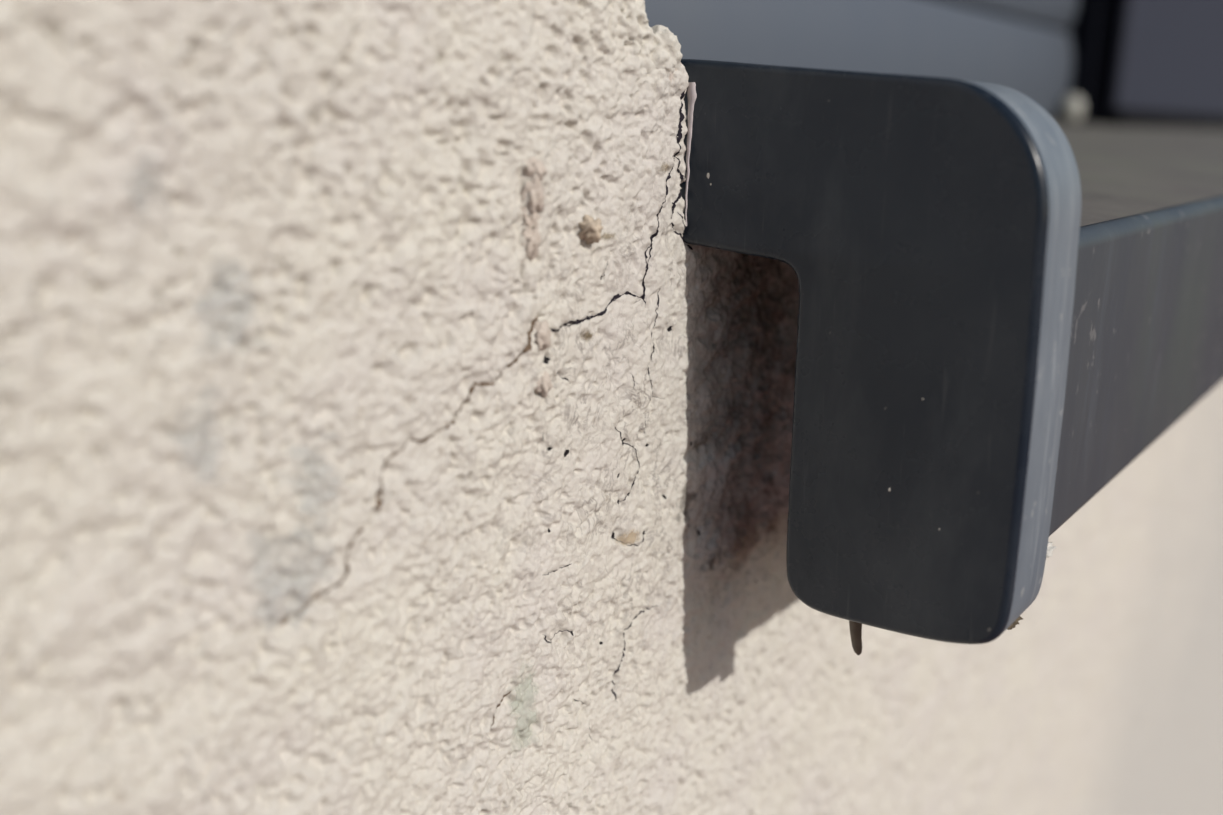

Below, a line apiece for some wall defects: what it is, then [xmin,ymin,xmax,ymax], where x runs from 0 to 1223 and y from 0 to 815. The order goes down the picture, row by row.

crack [278,91,693,626]
crack [611,606,654,703]